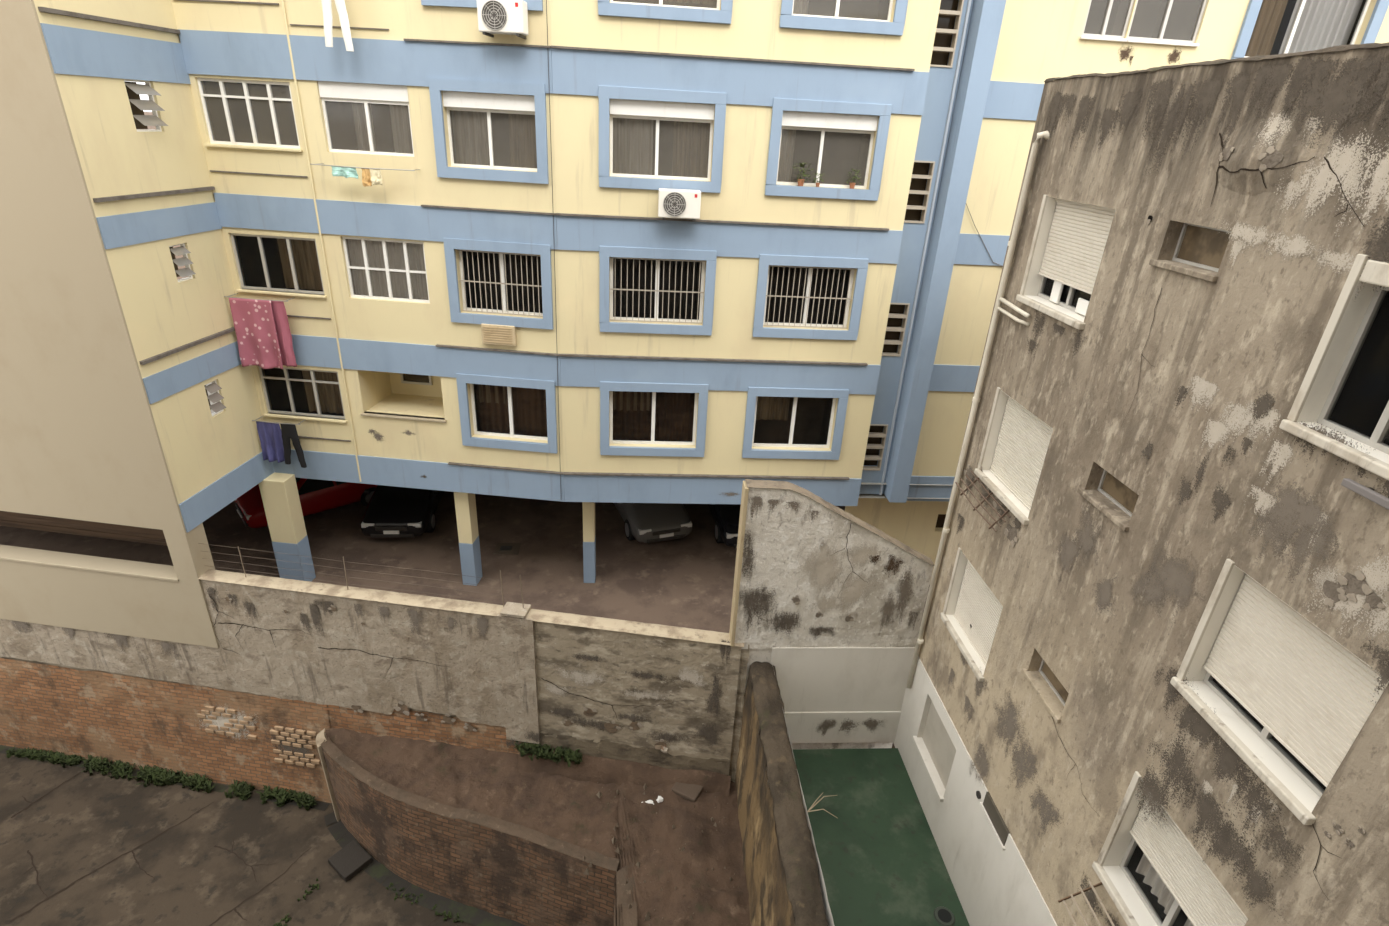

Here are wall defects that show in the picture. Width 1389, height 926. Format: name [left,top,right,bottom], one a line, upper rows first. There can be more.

leakage [1046,54,1389,298]
crack [1210,133,1365,227]
leakage [1173,375,1389,703]
leakage [207,587,259,622]
leakage [300,600,334,642]
leakage [354,604,424,639]
leakage [476,617,489,638]
leakage [505,492,919,763]
spalling [189,704,321,769]
leakage [948,651,1064,836]
leakage [1131,660,1306,924]